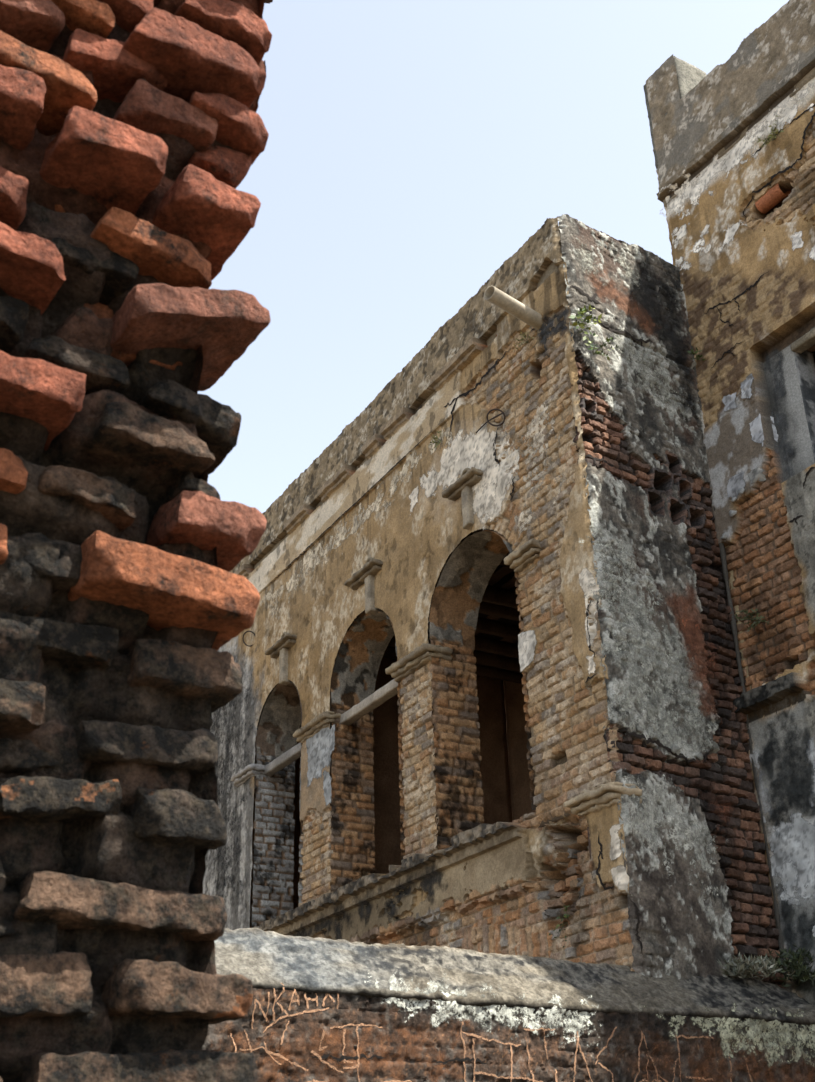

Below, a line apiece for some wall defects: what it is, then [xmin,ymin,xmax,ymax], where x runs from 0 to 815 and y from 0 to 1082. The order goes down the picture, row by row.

peeling [659,83,815,270]
leakage [629,261,699,414]
flaking render [260,307,815,988]
leakage [206,690,251,904]
leakage [750,718,815,824]
crack [596,836,644,957]
leakage [780,901,815,957]